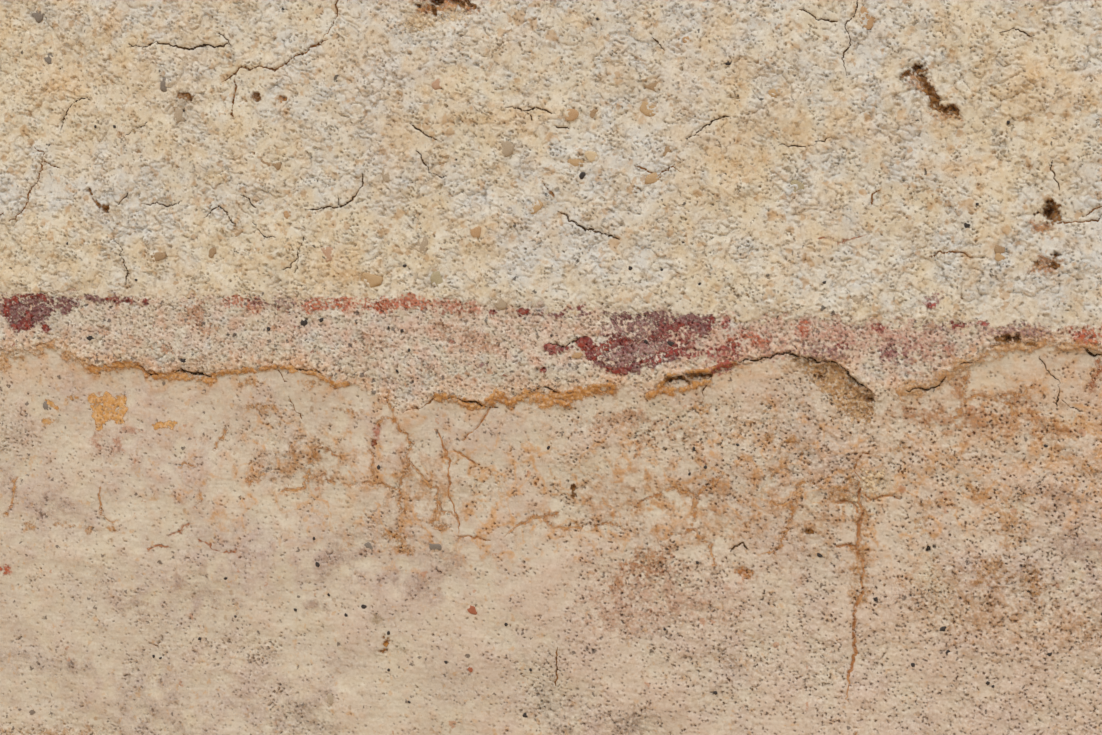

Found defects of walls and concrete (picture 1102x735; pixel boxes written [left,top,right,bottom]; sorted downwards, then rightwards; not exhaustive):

crack [129,0,339,118]
spalling [395,0,480,32]
crack [506,106,569,129]
crack [799,2,858,75]
spalling [900,63,960,118]
crack [206,195,304,273]
crack [307,173,364,211]
crack [558,211,619,240]
crack [701,352,874,405]
crack [906,347,1102,419]
crack [245,393,818,566]
crack [836,452,901,702]